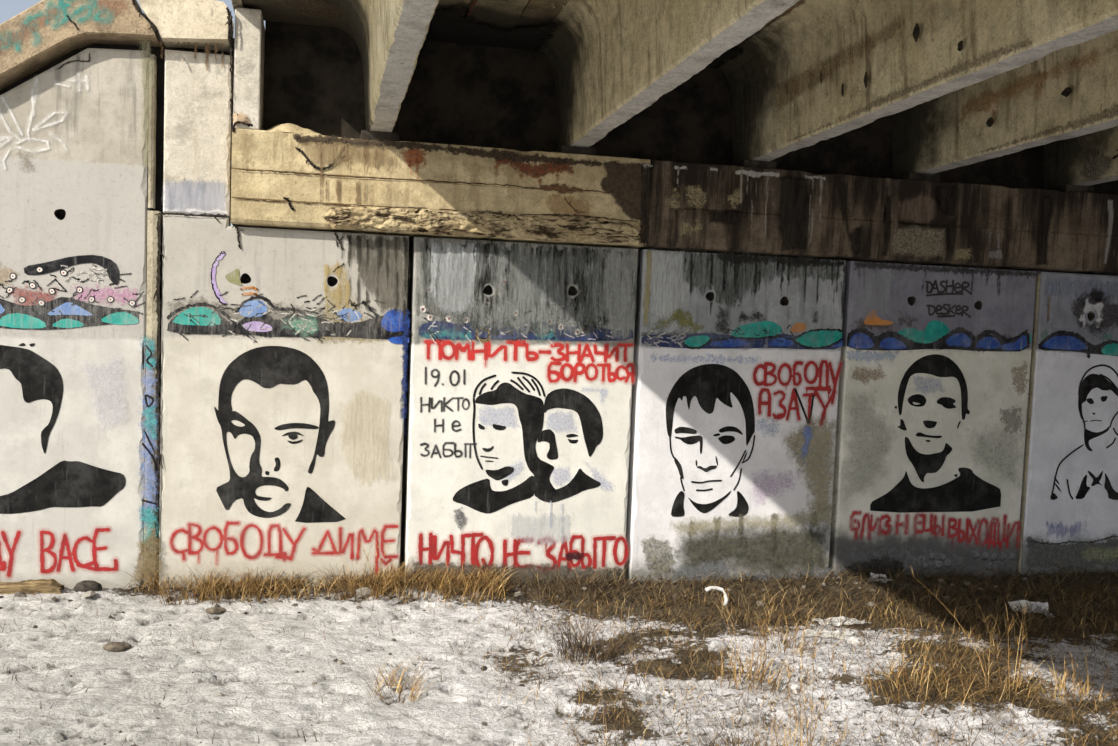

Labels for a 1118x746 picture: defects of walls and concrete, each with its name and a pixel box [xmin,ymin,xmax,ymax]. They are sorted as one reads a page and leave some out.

crack [132,0,164,45]
corrosion [401,148,426,178]
corrosion [495,159,583,194]
leakage [293,133,1118,339]
leakage [677,512,1011,581]